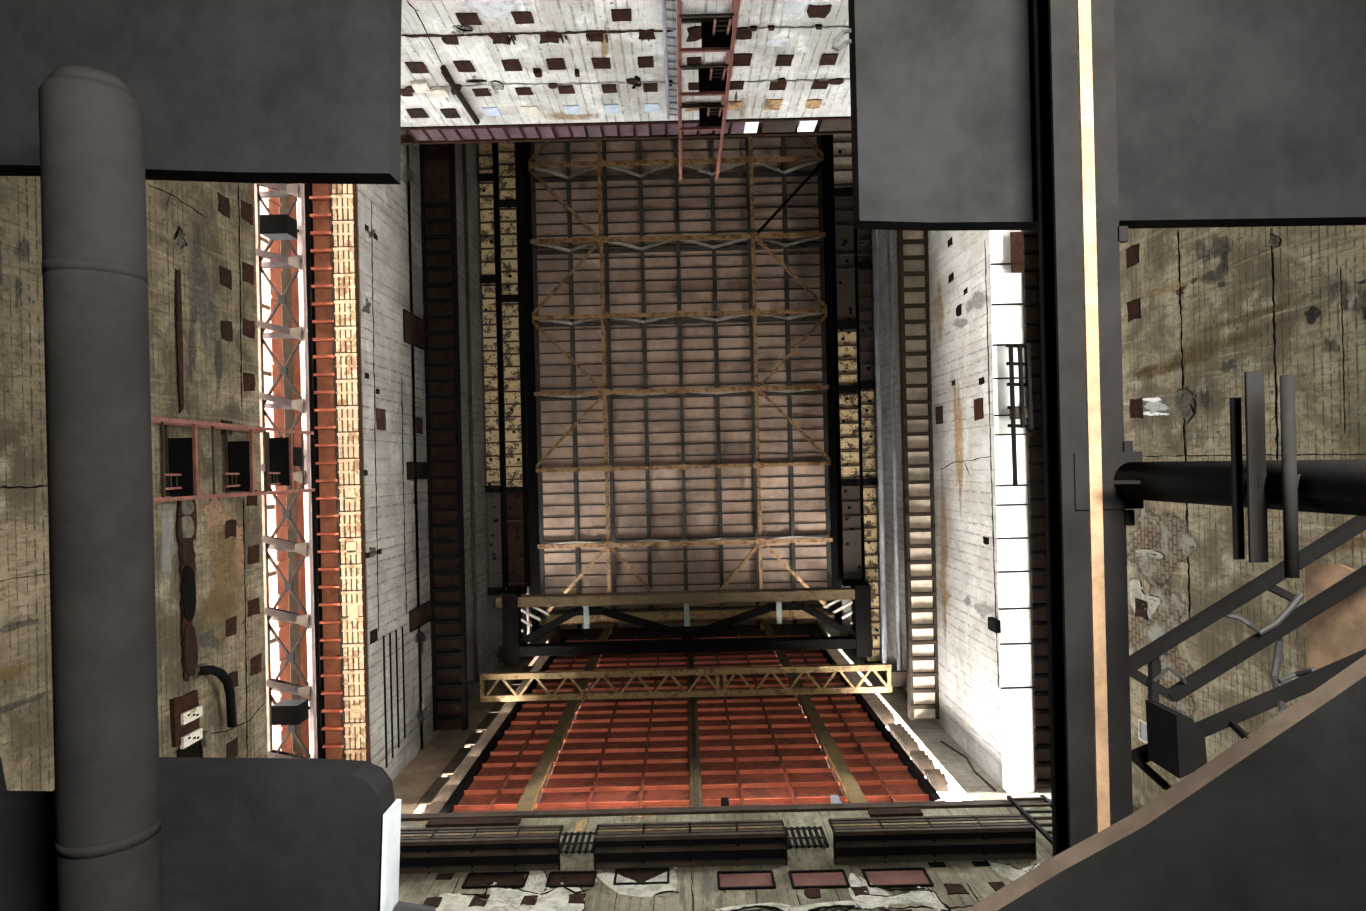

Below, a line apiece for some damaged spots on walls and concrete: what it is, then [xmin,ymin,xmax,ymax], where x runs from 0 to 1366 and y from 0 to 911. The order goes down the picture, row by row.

crack [1144,228,1366,461]
crack [0,483,48,491]
flaking render [1127,505,1198,719]
crack [1184,503,1192,619]
flaking render [436,867,679,911]
flaking render [711,873,951,911]